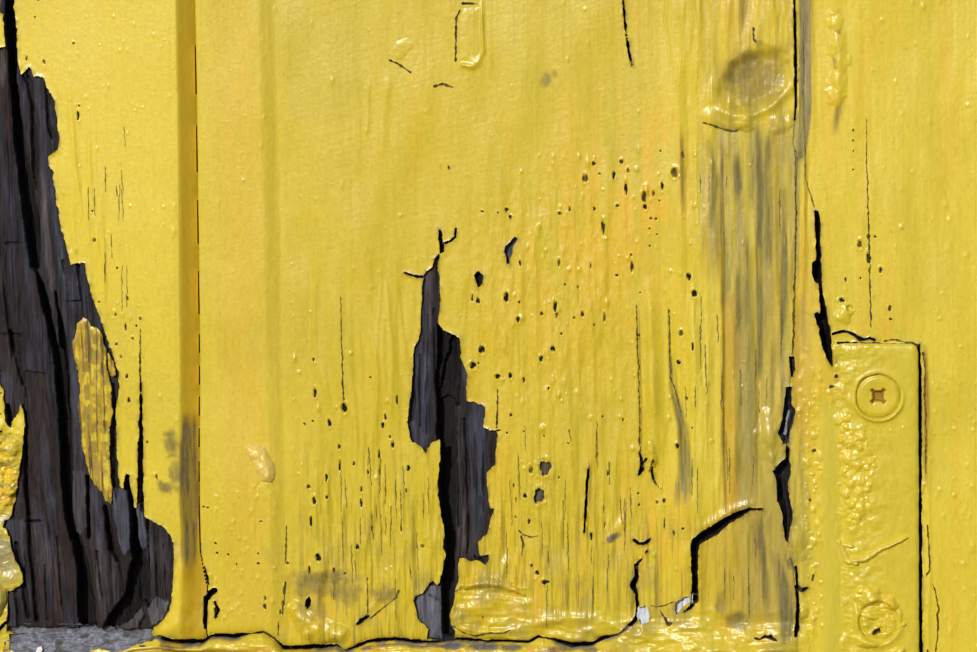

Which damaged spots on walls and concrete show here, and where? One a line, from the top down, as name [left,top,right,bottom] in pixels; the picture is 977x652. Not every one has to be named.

crack [622,0,633,66]
crack [702,122,739,132]
crack [778,0,927,474]
peeling [0,0,174,630]
peeling [396,230,508,642]
crack [494,389,502,431]
crack [506,297,767,626]
crack [724,538,814,641]
crack [926,525,940,652]